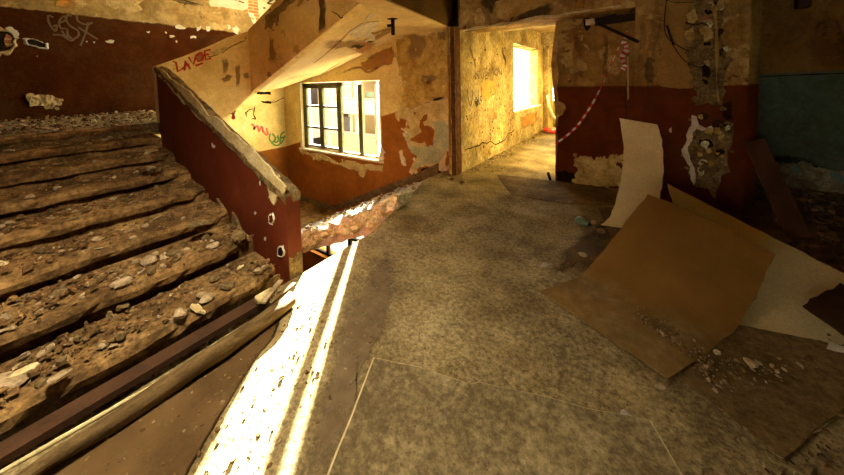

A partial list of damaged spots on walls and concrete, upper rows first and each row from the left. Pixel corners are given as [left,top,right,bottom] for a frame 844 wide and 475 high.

flaking render [26,93,64,110]
peeling [348,13,449,174]
flaking render [655,0,734,200]
flaking render [572,153,623,188]
peeling [776,161,844,194]